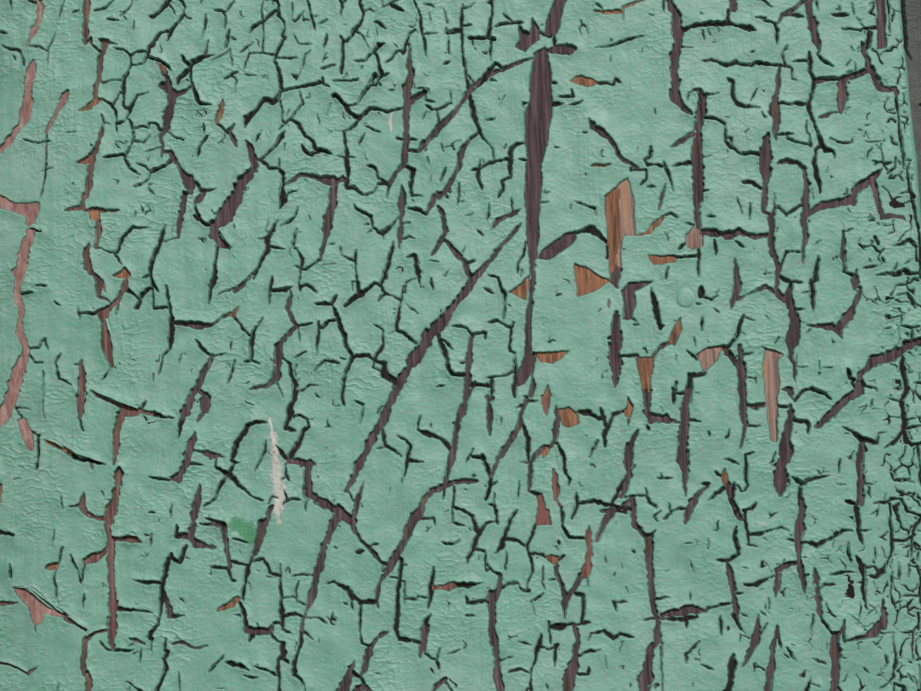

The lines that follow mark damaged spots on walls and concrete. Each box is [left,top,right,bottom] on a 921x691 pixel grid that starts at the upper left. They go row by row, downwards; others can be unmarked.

peeling [26,0,48,52]
peeling [0,60,69,193]
peeling [472,0,677,397]
peeling [648,224,702,278]
peeling [0,196,48,451]
crack [32,0,633,691]
crack [557,0,921,691]
peeling [746,349,788,442]
crack [0,455,8,502]
peeling [0,569,90,631]
peeling [0,657,35,675]